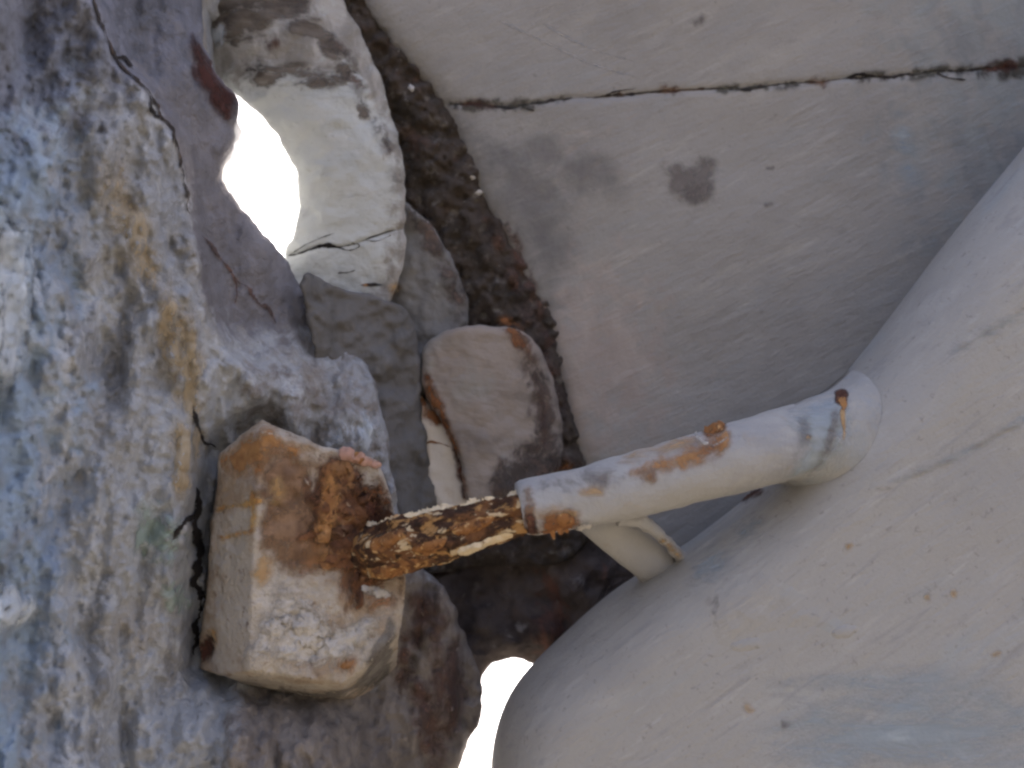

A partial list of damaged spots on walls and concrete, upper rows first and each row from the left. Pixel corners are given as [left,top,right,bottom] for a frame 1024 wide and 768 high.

crack [93,0,190,214]
rust [191,35,237,119]
crack [454,66,1019,111]
water stain [669,159,714,202]
crack [288,229,399,274]
rust [493,224,555,376]
crack [192,407,216,448]
rust [635,420,729,483]
rust [835,389,848,436]
rust [217,374,593,610]
crack [173,487,206,655]